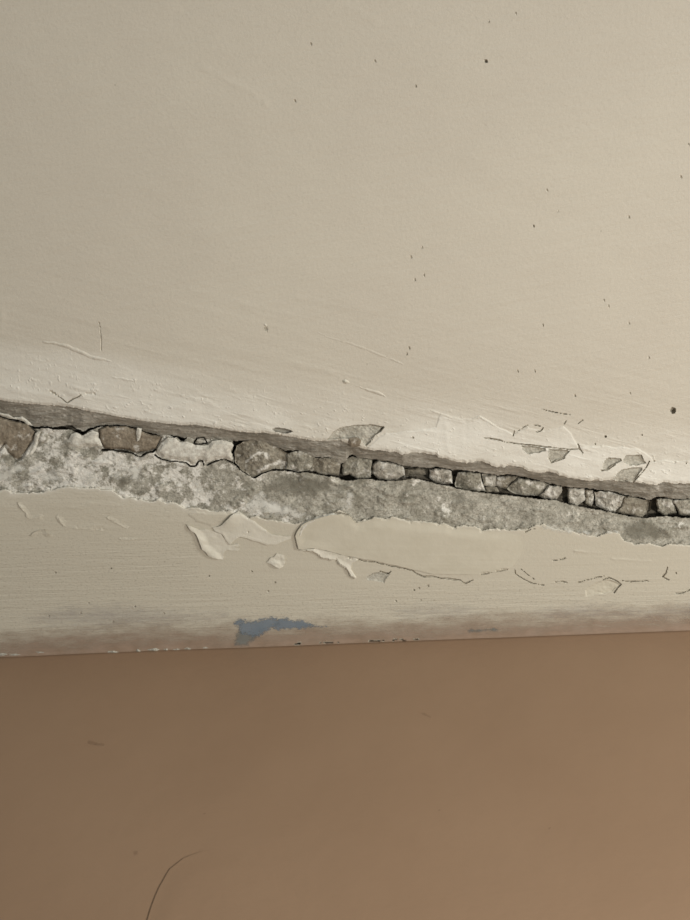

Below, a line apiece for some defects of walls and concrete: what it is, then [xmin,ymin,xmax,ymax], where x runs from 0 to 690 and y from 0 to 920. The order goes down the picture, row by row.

crack [0,416,690,518]
flaking render [0,401,690,584]
crack [361,560,603,585]